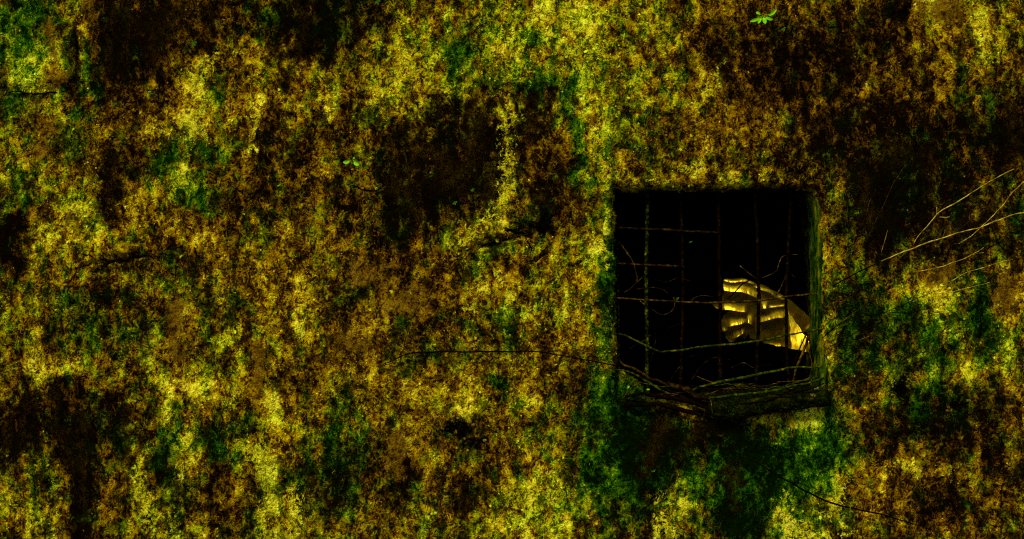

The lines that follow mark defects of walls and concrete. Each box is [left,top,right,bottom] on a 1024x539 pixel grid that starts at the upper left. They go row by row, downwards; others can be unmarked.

leakage [378,78,580,236]